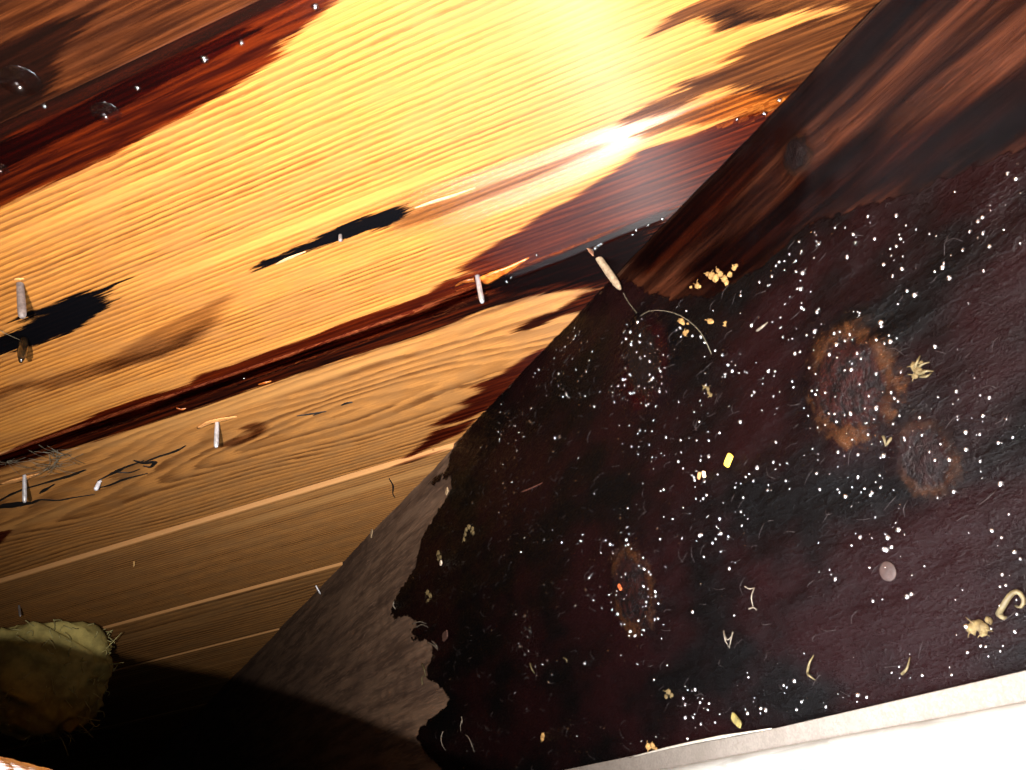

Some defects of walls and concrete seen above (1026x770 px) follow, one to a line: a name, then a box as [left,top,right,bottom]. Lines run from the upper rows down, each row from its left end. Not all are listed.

leakage [0,0,1026,468]
crack [0,445,186,509]